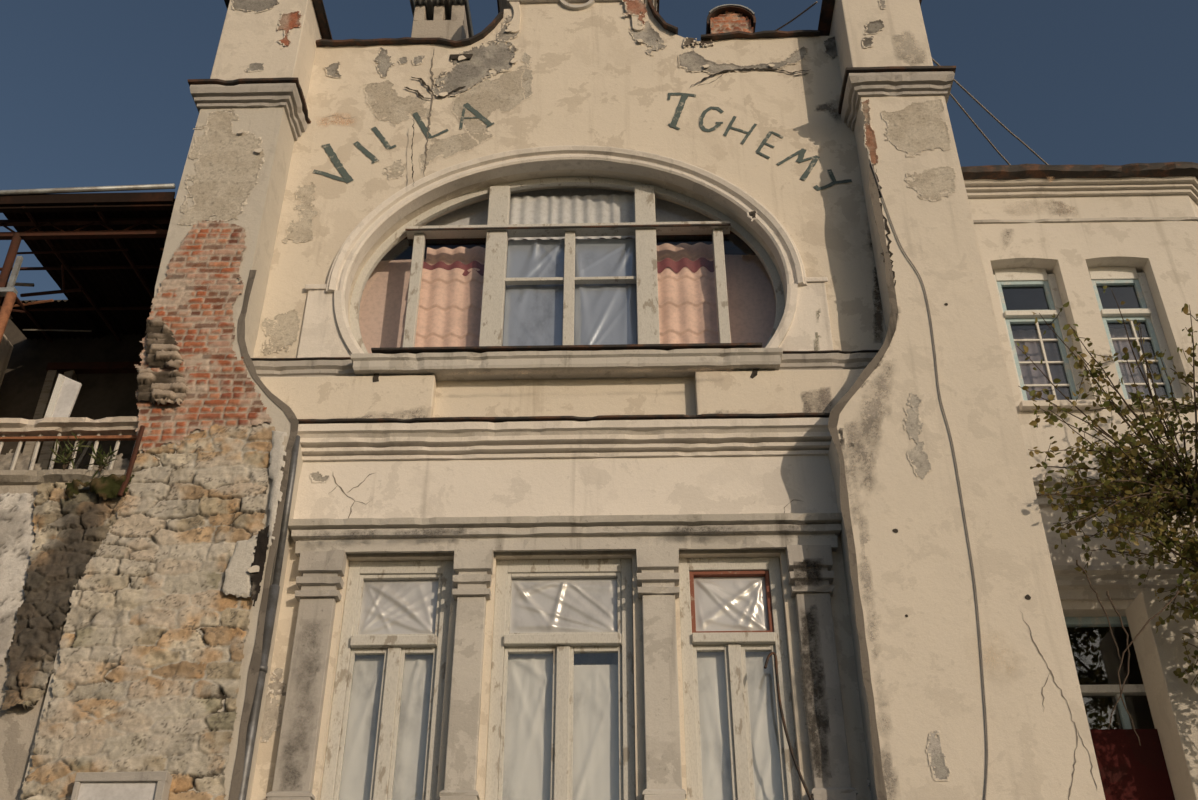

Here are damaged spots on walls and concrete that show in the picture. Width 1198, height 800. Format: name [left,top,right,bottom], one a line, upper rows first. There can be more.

flaking render [231,0,303,49]
flaking render [363,15,533,180]
flaking render [622,0,667,57]
flaking render [678,36,838,75]
flaking render [860,98,957,202]
flaking render [261,308,300,355]
flaking render [2,109,287,800]
crack [331,473,374,518]
flaking render [902,393,934,479]
water stain [801,612,829,777]
crack [1021,612,1097,800]
flaking render [926,730,951,781]